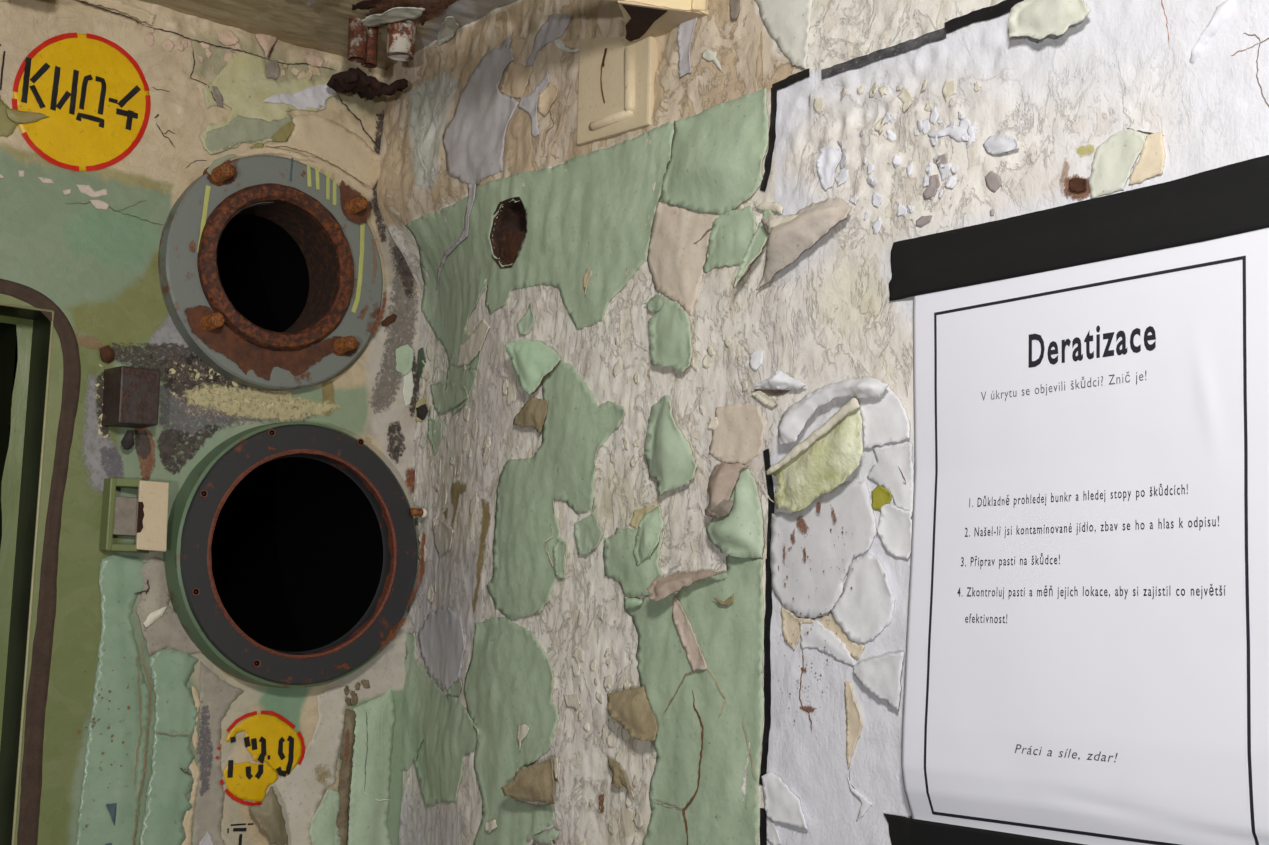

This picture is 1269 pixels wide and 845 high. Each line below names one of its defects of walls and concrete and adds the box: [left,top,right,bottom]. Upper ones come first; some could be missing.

peeling [1008,0,1091,40]
peeling [0,98,49,137]
rust [207,160,237,186]
rust [339,180,373,224]
peeling [841,80,1019,227]
rust [358,239,397,334]
rust [185,305,360,381]
peeling [249,13,914,845]
peeling [76,554,244,845]